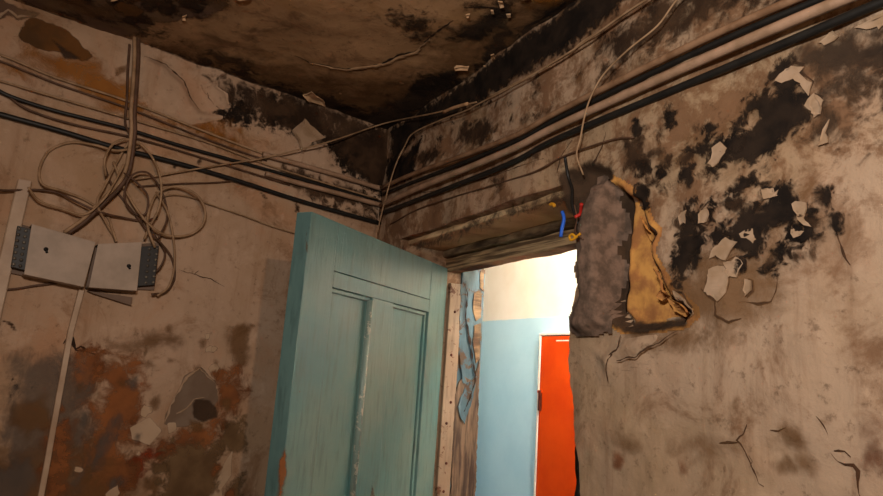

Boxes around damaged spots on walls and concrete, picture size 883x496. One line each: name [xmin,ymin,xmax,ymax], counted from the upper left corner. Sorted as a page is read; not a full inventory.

peeling [0,0,244,61]
damp [26,48,143,114]
damp [137,0,780,220]
peeling [775,61,830,146]
peeling [708,142,727,167]
damp [622,20,883,319]
spalling [559,161,700,337]
peeling [701,228,777,324]
peeling [789,201,811,238]
peeling [2,346,251,496]
crack [720,424,764,487]
crack [816,416,860,496]